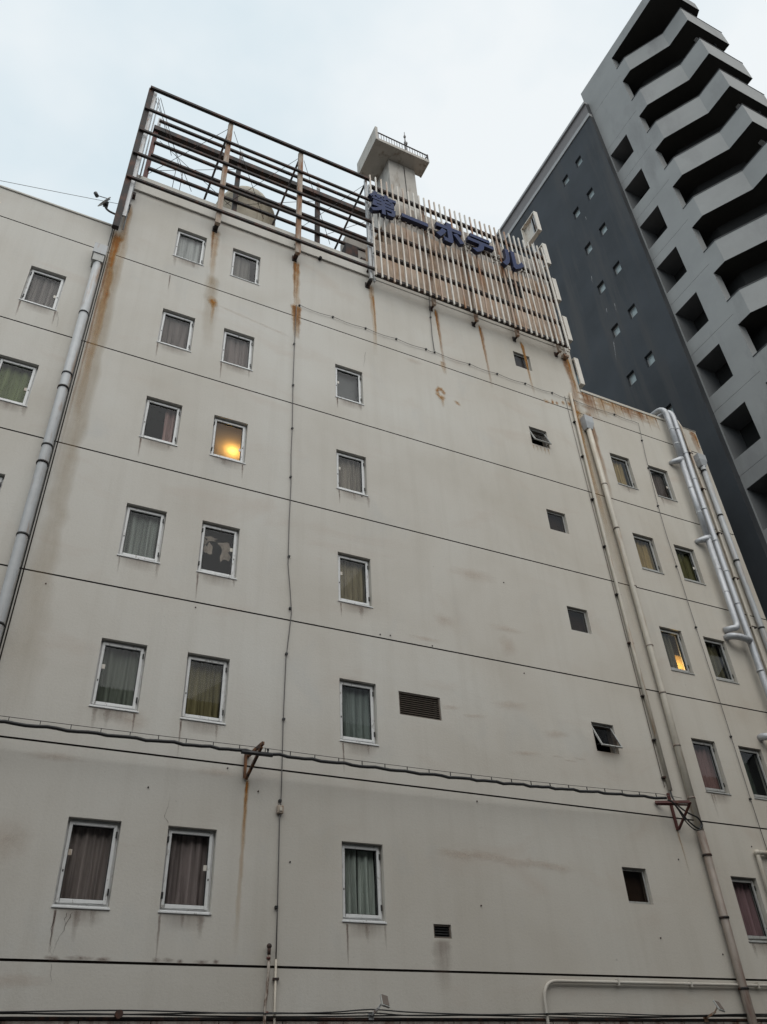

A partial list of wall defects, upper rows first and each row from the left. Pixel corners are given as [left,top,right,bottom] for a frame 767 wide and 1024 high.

rust [92,234,123,324]
rust [546,392,657,449]